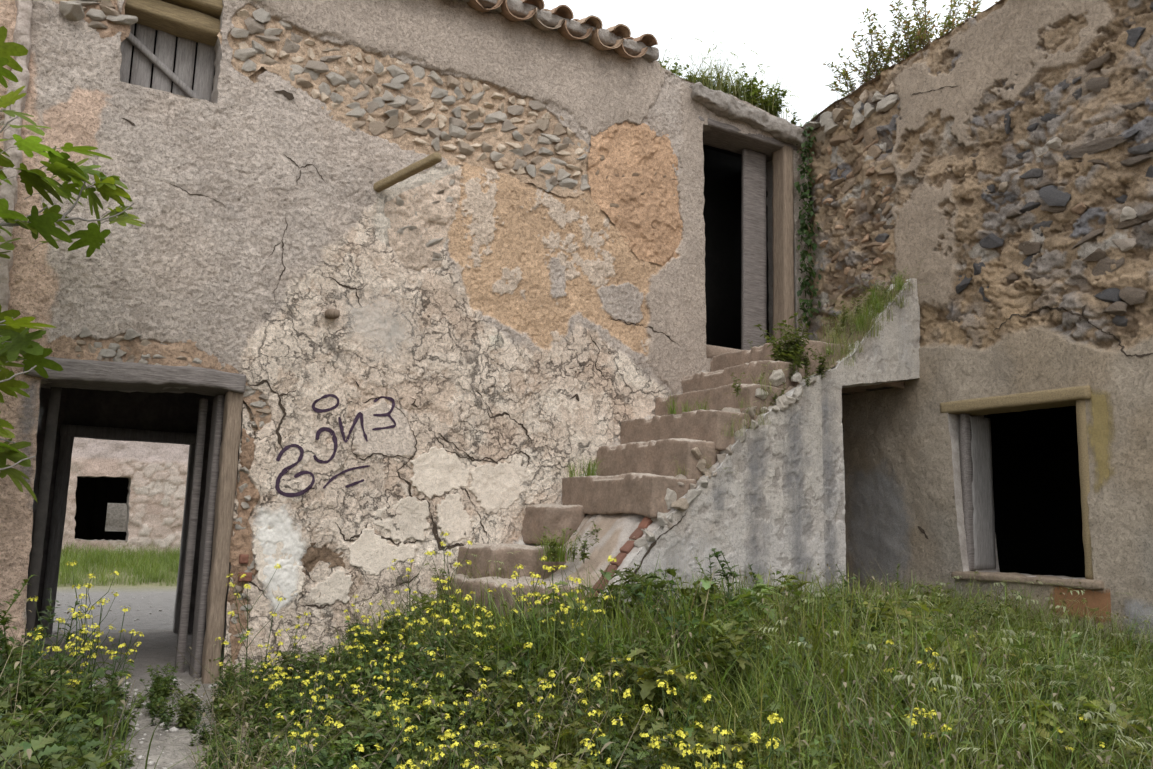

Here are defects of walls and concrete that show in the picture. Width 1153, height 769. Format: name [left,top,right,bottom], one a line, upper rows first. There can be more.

flaking render [1123,16,1146,47]
flaking render [1058,51,1110,100]
flaking render [217,4,683,271]
flaking render [1004,112,1060,142]
flaking render [985,130,1153,284]
flaking render [956,262,990,303]
flaking render [1072,195,1153,327]
crack [993,305,1153,358]
flaking render [42,327,528,664]